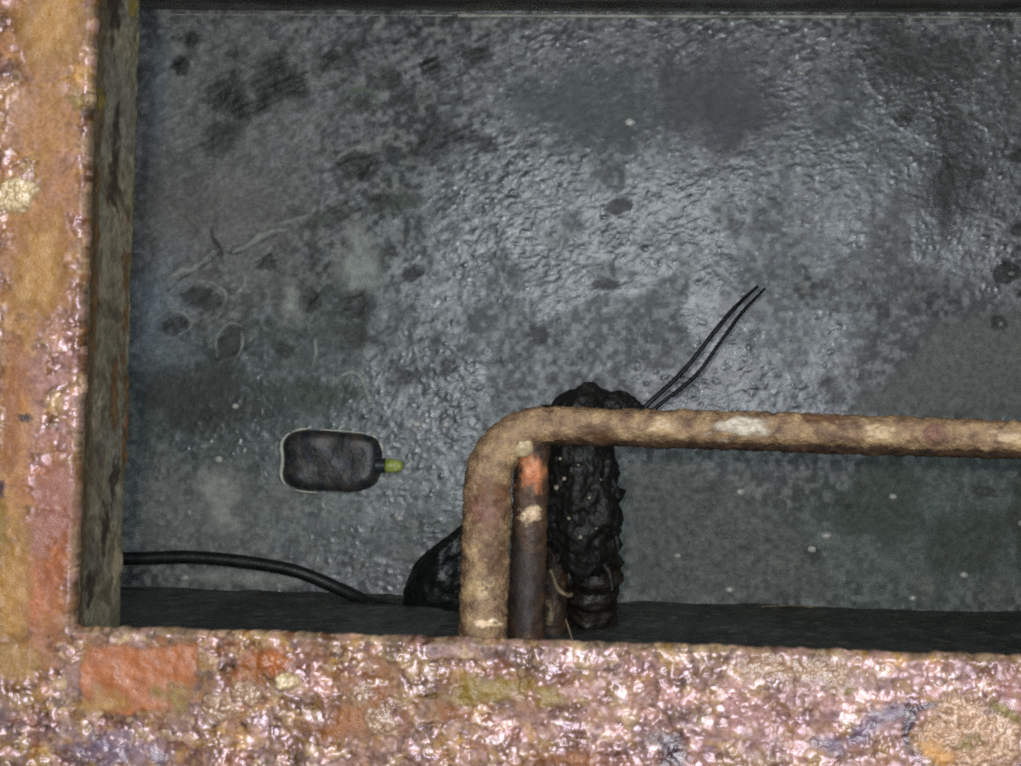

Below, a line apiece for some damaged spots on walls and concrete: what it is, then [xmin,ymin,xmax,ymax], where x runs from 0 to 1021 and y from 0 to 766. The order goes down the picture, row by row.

water stain [203,51,305,153]
water stain [337,145,378,178]
water stain [143,280,227,349]
water stain [283,281,303,324]
water stain [330,223,380,347]
water stain [855,312,1021,416]
rust [803,414,859,429]
water stain [198,469,245,535]
rust [517,506,540,527]
rust [514,454,546,494]
water stain [176,568,301,588]
rust [74,644,198,716]